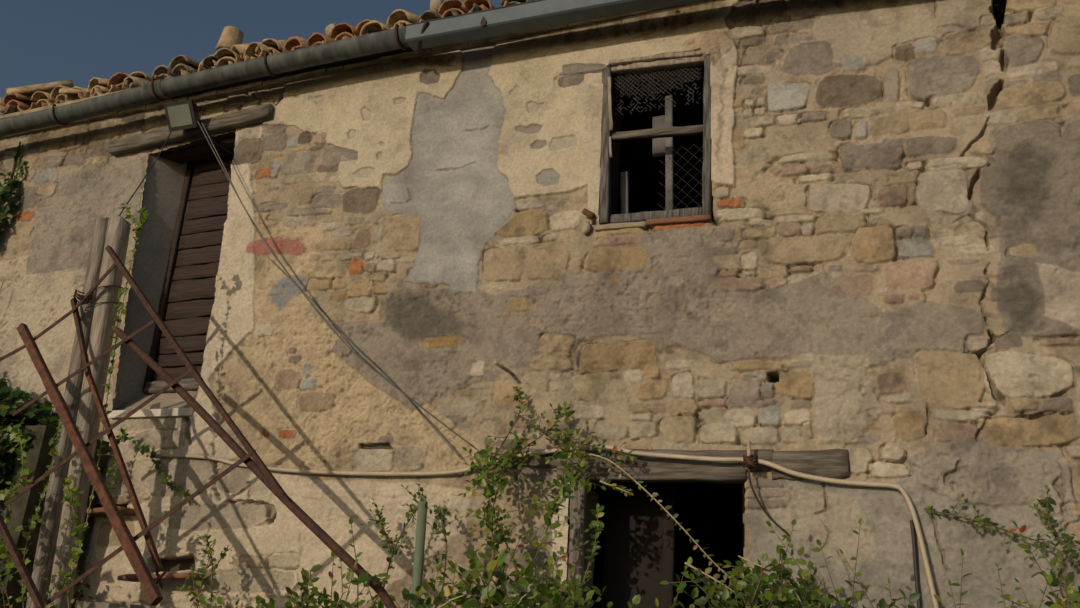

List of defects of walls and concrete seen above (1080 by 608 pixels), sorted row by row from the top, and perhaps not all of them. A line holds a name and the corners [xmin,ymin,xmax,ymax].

spalling [725,0,813,147]
peeling [230,44,577,298]
crack [934,0,1076,485]
spalling [568,350,816,444]
crack [924,402,932,435]
crack [1052,462,1069,513]
crack [925,506,951,571]